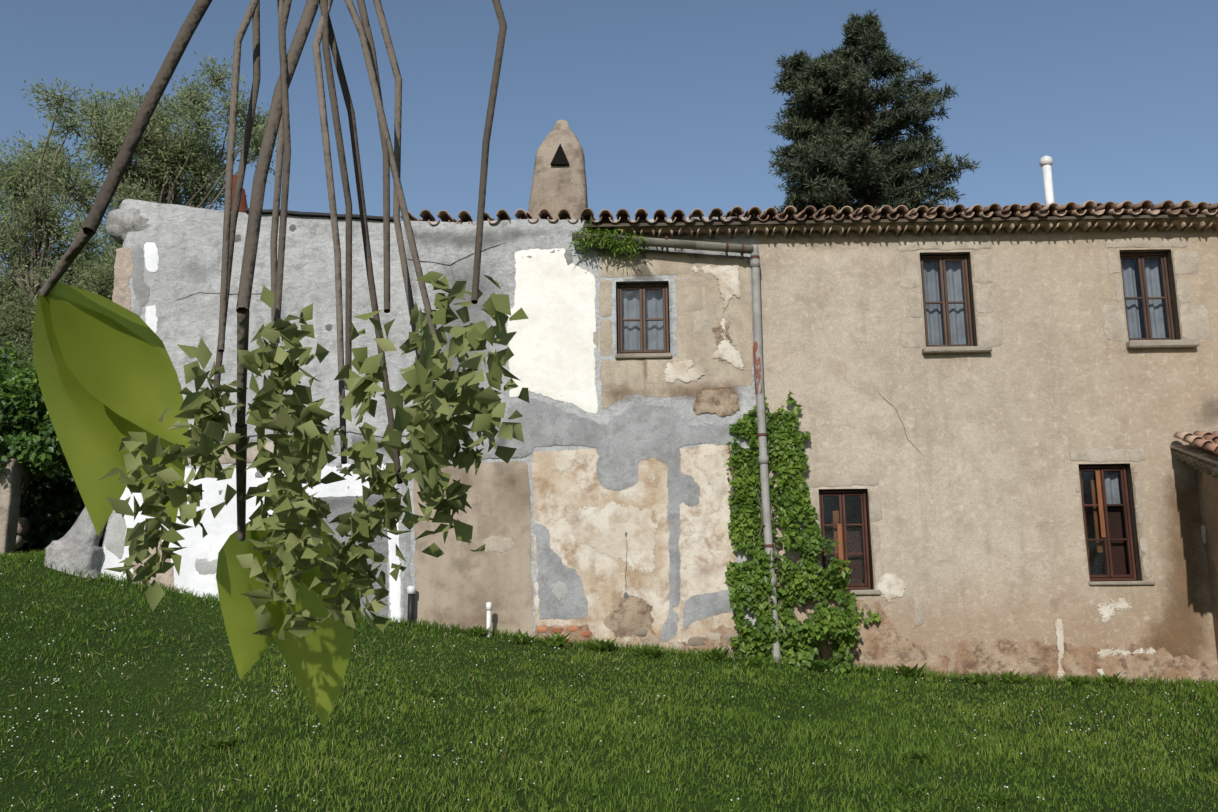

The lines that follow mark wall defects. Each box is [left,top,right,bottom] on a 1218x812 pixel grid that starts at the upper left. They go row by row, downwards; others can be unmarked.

peeling [691,263,745,370]
spalling [663,358,740,417]
peeling [302,462,387,497]
peeling [99,467,284,601]
peeling [387,522,401,622]
peeling [481,535,515,553]
peeling [531,443,747,658]
leakage [1154,491,1198,658]